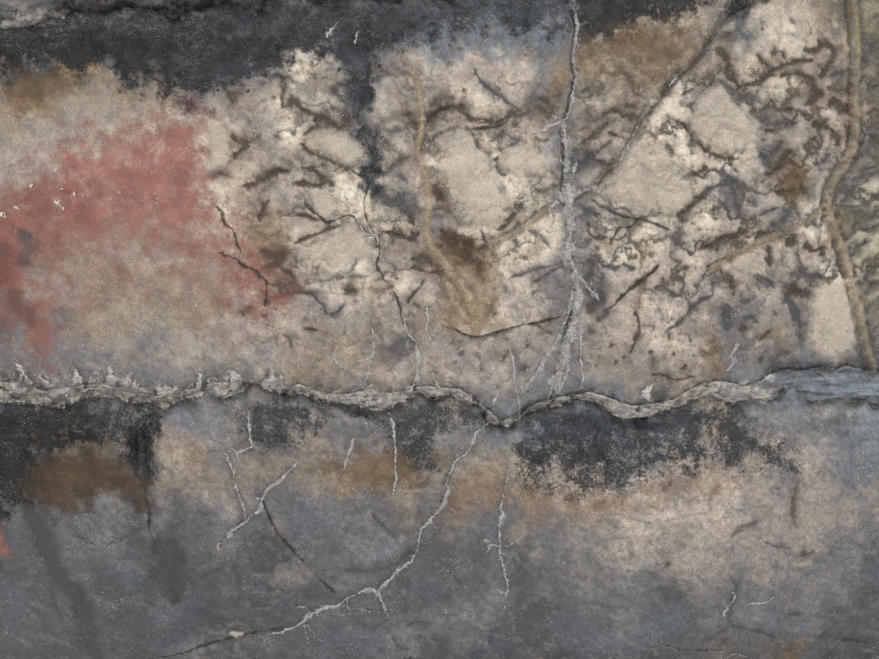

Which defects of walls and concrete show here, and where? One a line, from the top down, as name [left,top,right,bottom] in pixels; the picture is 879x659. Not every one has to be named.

crack [667,4,754,91]
crack [443,0,667,400]
crack [760,367,839,381]
crack [262,500,304,562]